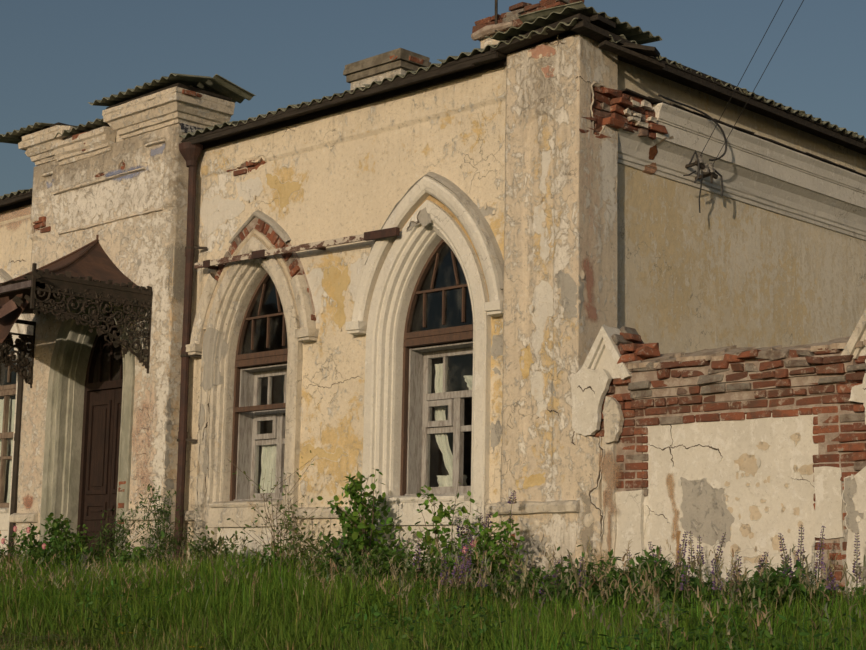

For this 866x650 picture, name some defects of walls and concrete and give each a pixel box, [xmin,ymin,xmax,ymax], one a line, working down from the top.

flaking render [579,81,668,140]
flaking render [31,216,51,234]
peeling [533,149,552,266]
flaking render [200,156,351,392]
spalling [518,269,585,419]
crack [304,375,362,411]
crack [536,407,576,445]
crack [646,425,724,468]
crack [589,436,604,538]
spalling [678,441,820,574]
spalling [842,474,866,544]